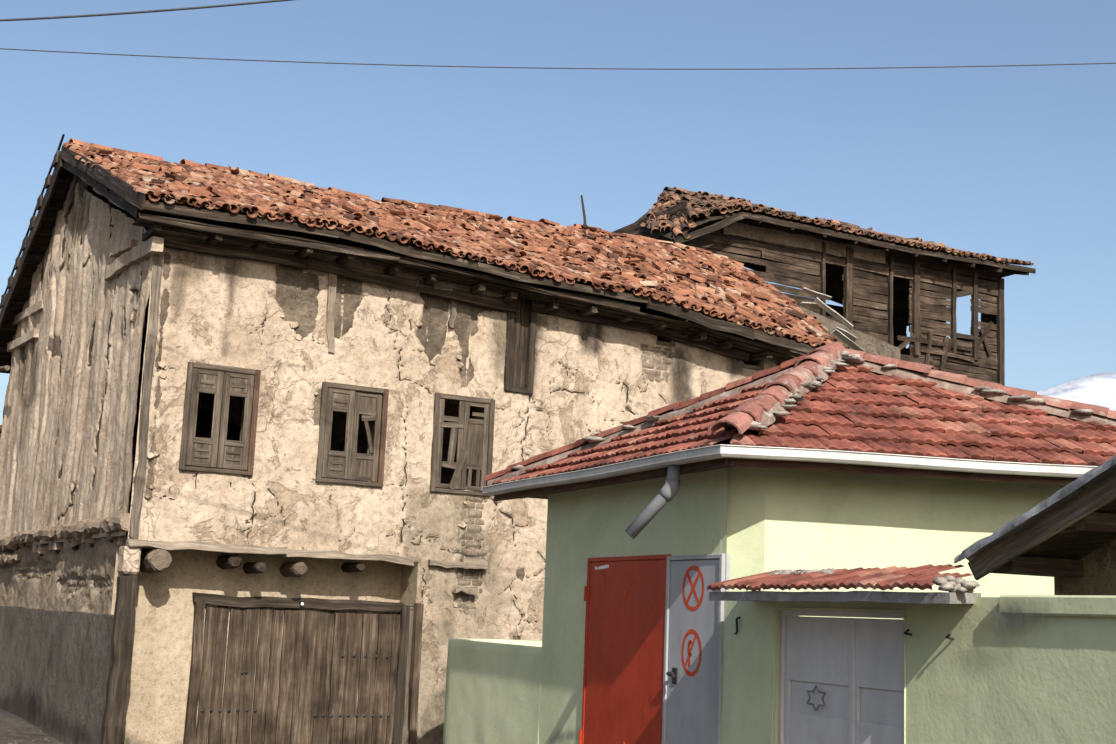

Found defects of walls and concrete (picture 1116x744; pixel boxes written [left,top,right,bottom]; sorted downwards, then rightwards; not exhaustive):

crack [41,194,146,520]
peeling [275,265,320,340]
peeling [331,275,369,340]
peeling [415,292,502,388]
crack [375,289,545,631]
peeling [452,497,488,615]